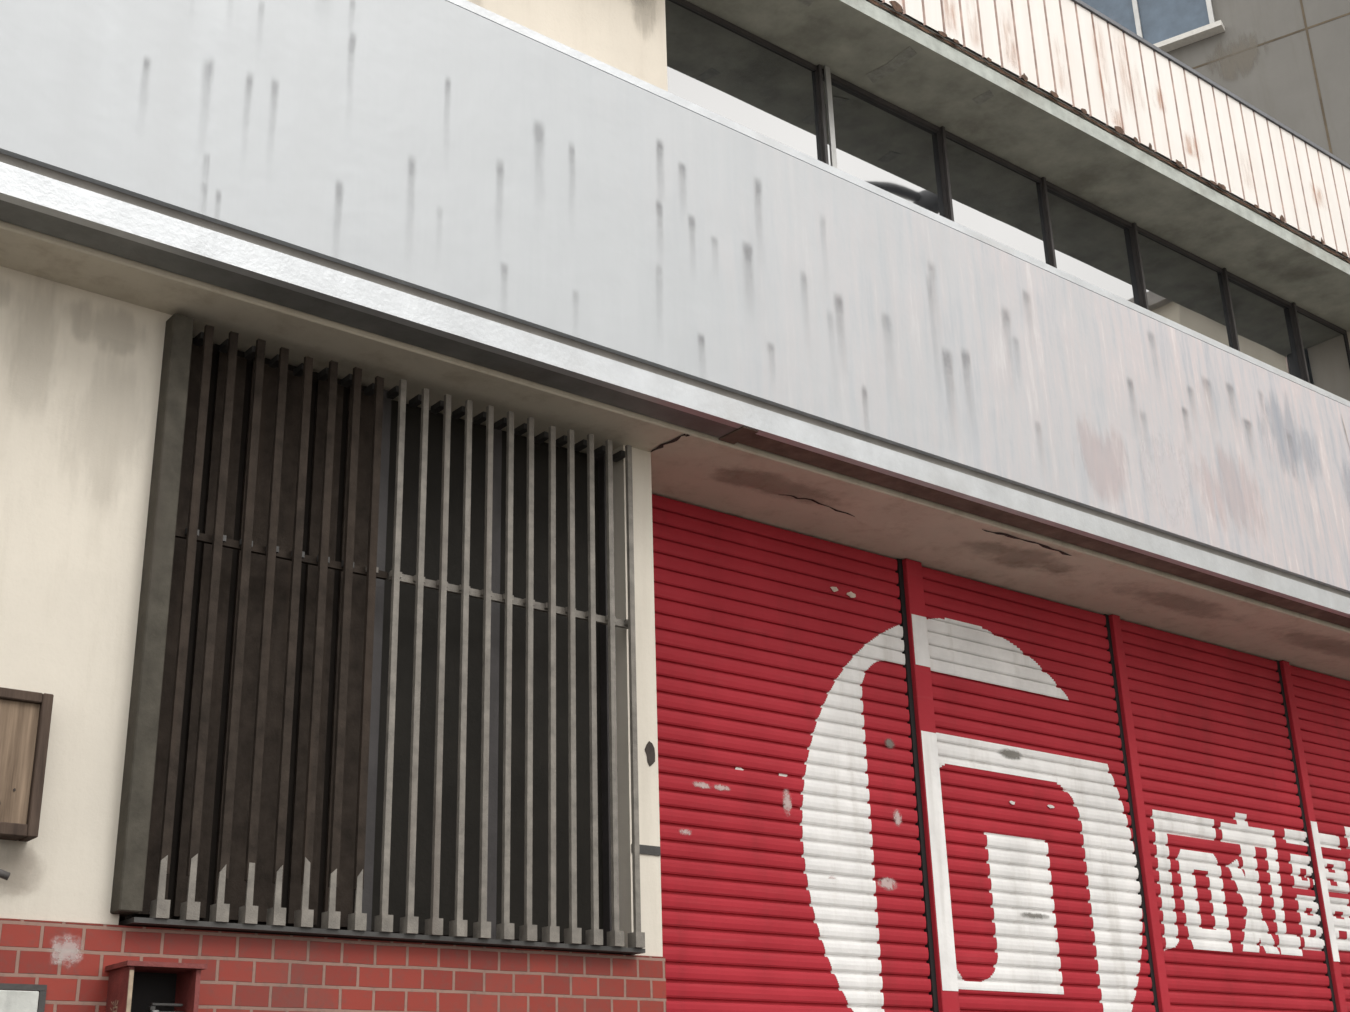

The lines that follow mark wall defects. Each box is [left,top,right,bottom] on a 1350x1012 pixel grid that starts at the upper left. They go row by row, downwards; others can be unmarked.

crack [651,434,690,452]
crack [787,495,855,517]